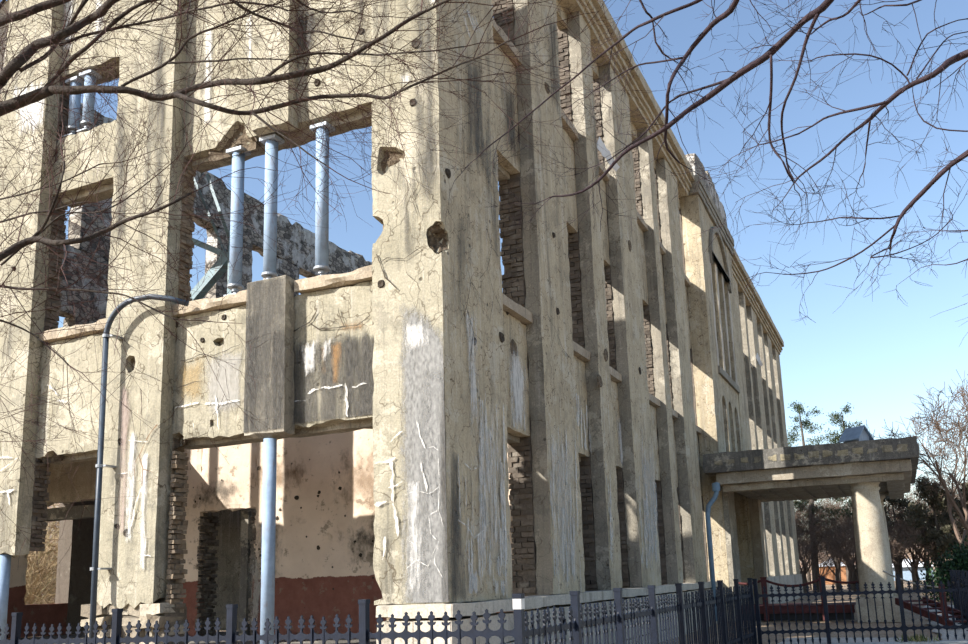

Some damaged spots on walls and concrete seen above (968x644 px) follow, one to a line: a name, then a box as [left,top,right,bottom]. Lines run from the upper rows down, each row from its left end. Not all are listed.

spalling [381,150,404,174]
spalling [428,222,449,254]
crack [175,344,240,429]
water stain [243,277,374,433]
crack [295,383,366,417]
crack [294,309,370,332]
water stain [407,326,423,346]
crack [119,425,157,526]
water stain [410,484,418,588]
crack [374,421,484,578]